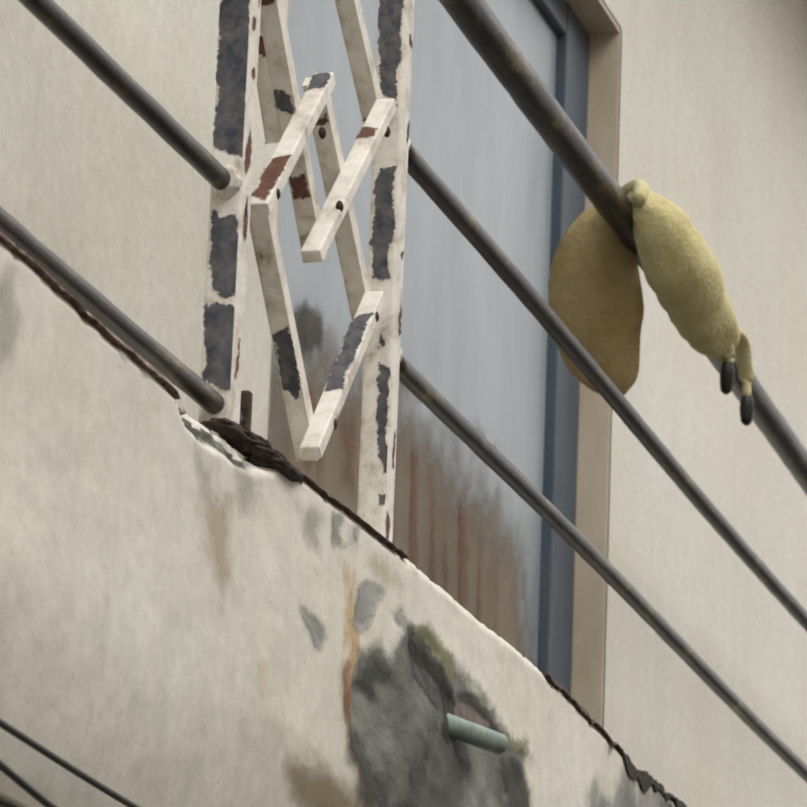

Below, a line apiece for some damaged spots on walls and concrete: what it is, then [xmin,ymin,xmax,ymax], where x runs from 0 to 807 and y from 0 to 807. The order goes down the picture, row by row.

peeling [333,512,346,548]
peeling [301,608,325,647]
peeling [352,580,386,631]
rust [345,604,359,726]
spalling [349,611,530,807]
leakage [591,778,668,807]